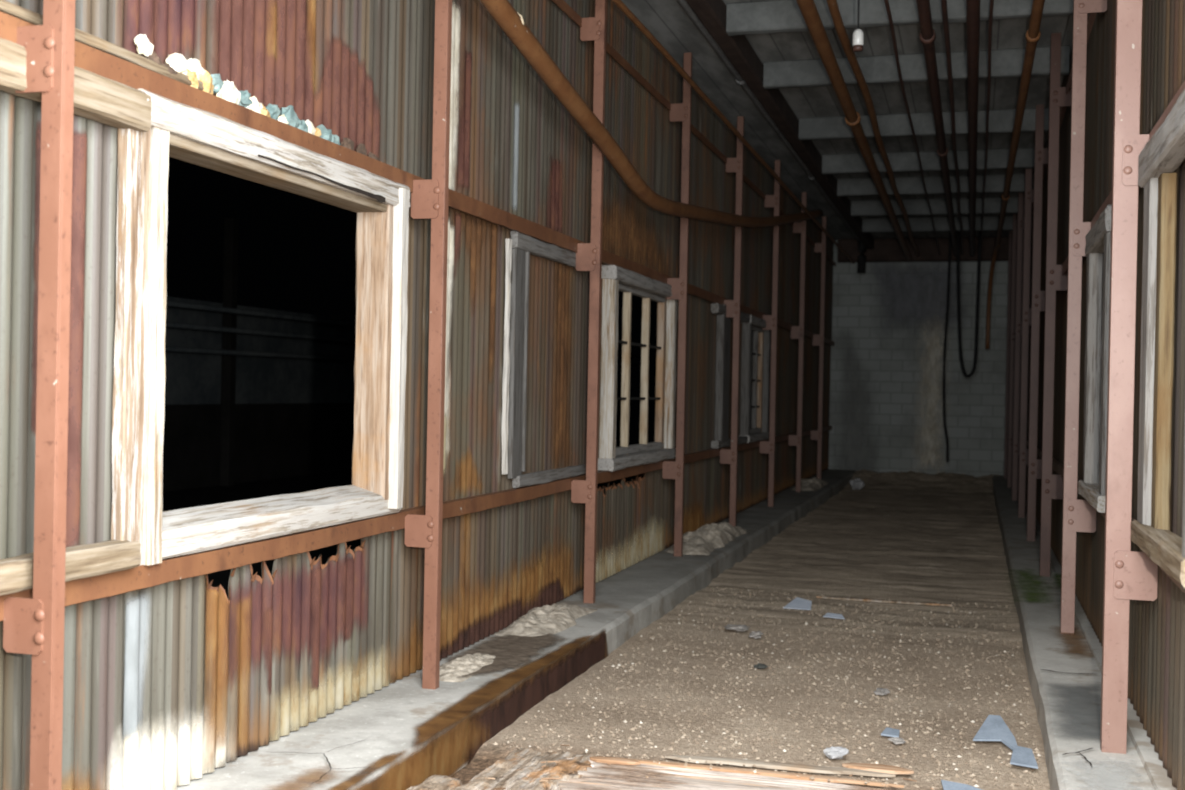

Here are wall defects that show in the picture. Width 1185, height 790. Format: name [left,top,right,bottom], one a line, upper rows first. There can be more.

rust [123,0,380,157]
rust [206,547,367,751]
rust [274,630,608,790]
rust [440,513,571,660]